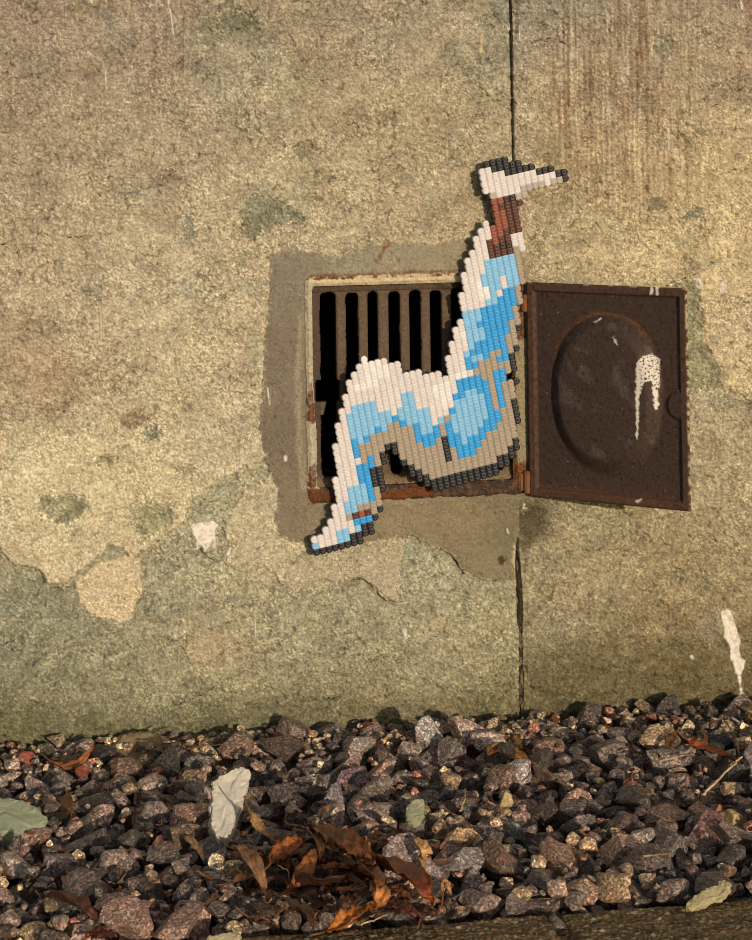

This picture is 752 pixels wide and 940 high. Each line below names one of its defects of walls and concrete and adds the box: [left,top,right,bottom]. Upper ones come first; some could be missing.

corrosion [309,464,335,503]
corrosion [381,487,440,500]
spalling [0,278,752,761]